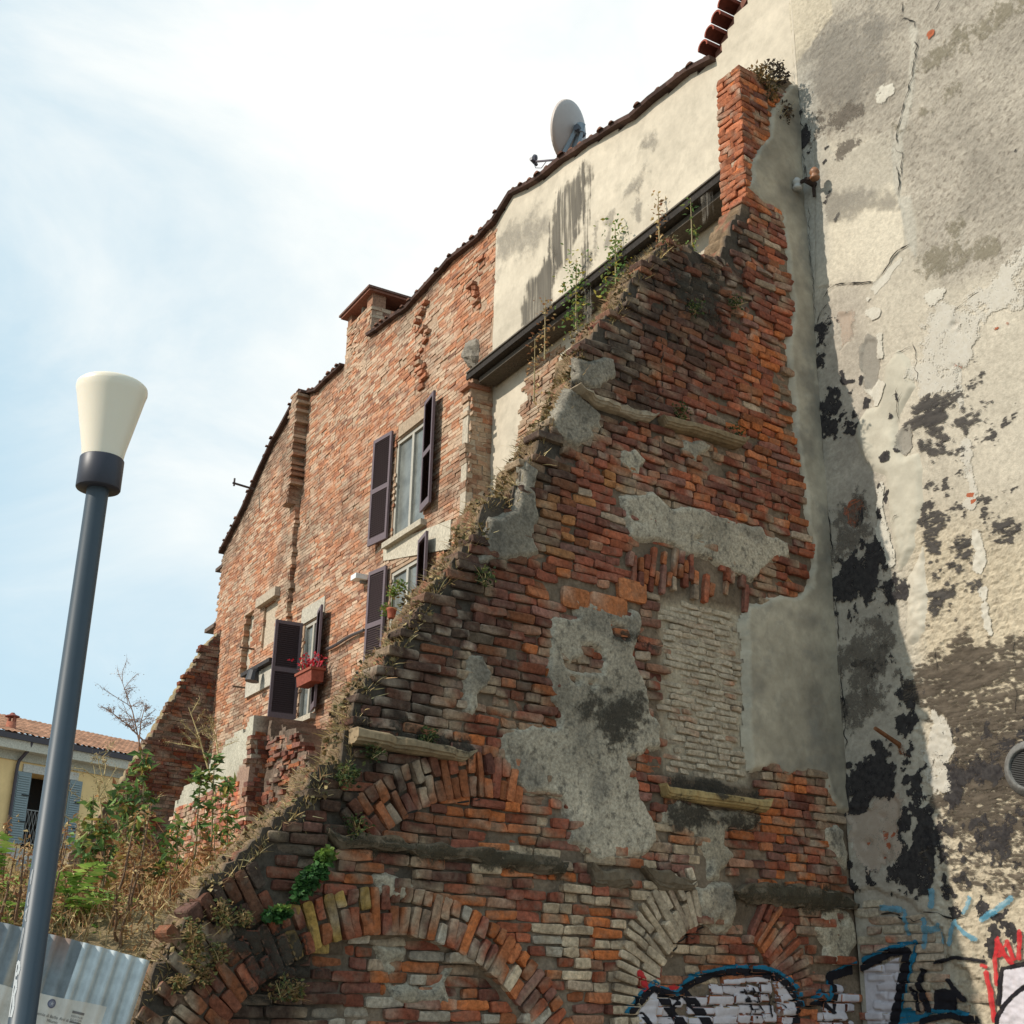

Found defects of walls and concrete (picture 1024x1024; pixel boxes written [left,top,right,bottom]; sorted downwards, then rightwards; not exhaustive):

crack [895,0,941,191]
damp [521,163,594,325]
crack [808,209,909,322]
flaking render [548,357,616,447]
flaking render [477,461,539,564]
flaking render [618,448,645,474]
flaking render [619,492,789,583]
flaking render [737,81,963,921]
flaking render [970,529,993,636]
flaking render [461,655,492,715]
flaking render [497,601,755,935]
flaking render [811,908,857,965]